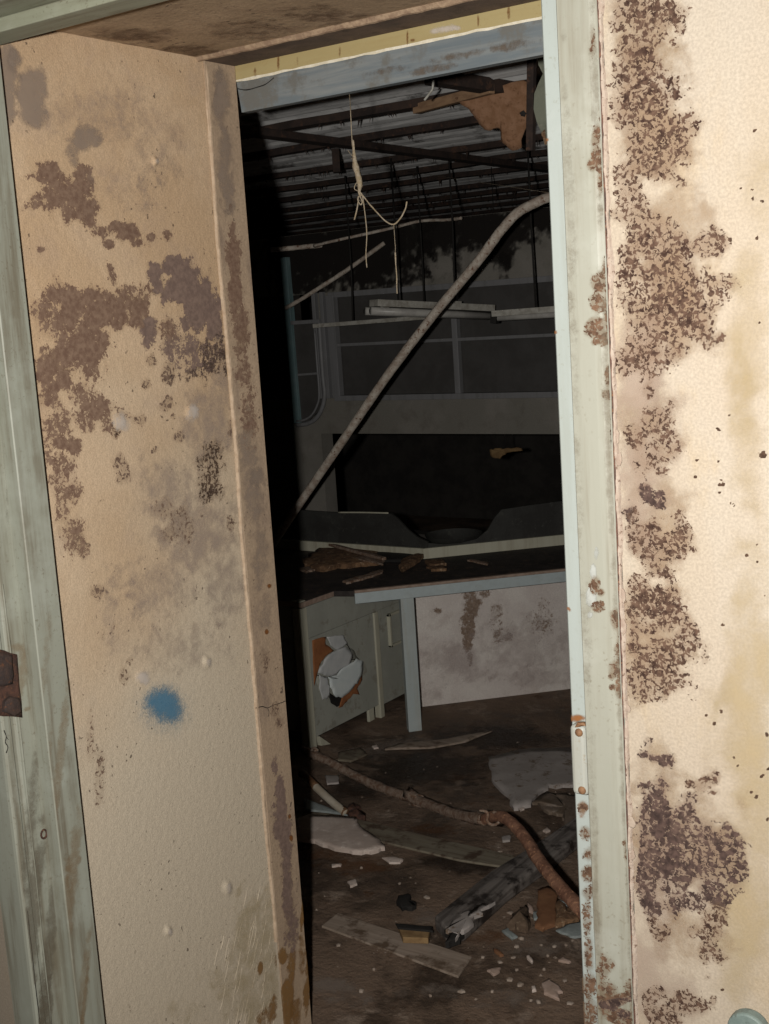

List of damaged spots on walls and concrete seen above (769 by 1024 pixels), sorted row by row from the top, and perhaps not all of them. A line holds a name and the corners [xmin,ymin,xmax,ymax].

damp [0,45,47,127]
damp [23,71,262,558]
damp [458,590,513,666]
rust [588,579,605,612]
rust [571,715,586,727]
rust [579,826,598,1024]